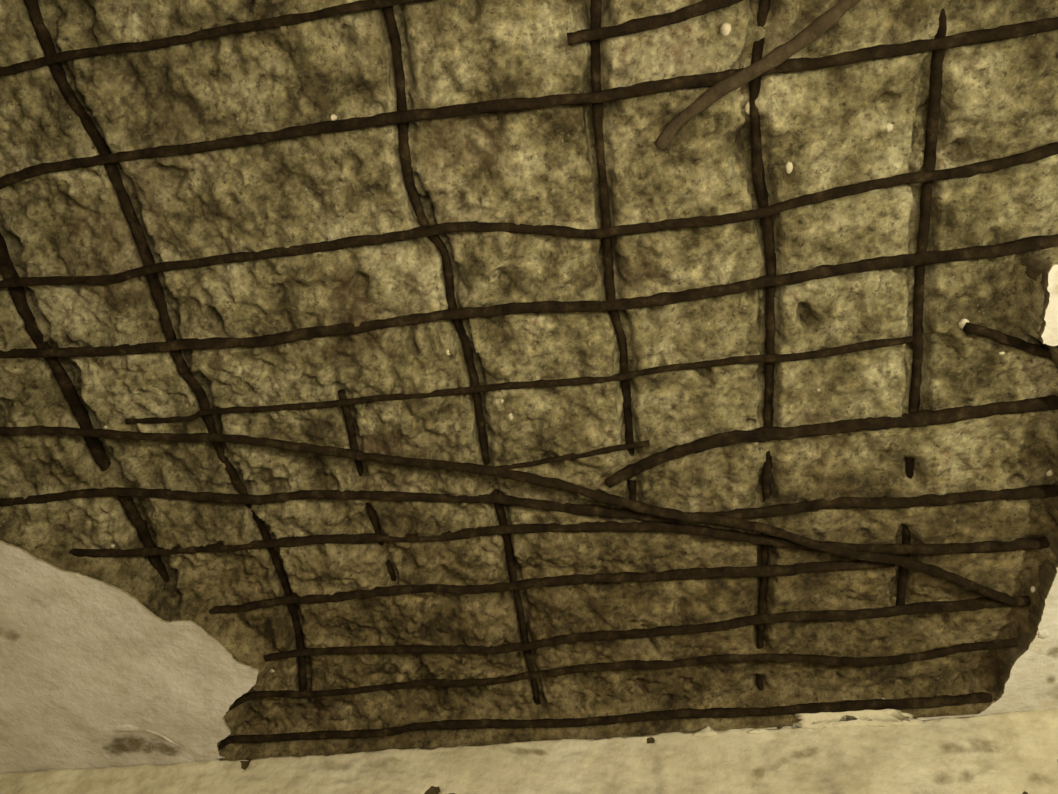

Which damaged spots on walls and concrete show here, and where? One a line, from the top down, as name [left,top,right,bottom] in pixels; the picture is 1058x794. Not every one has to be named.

spalling [0,0,1058,280]
spalling [0,142,1058,771]